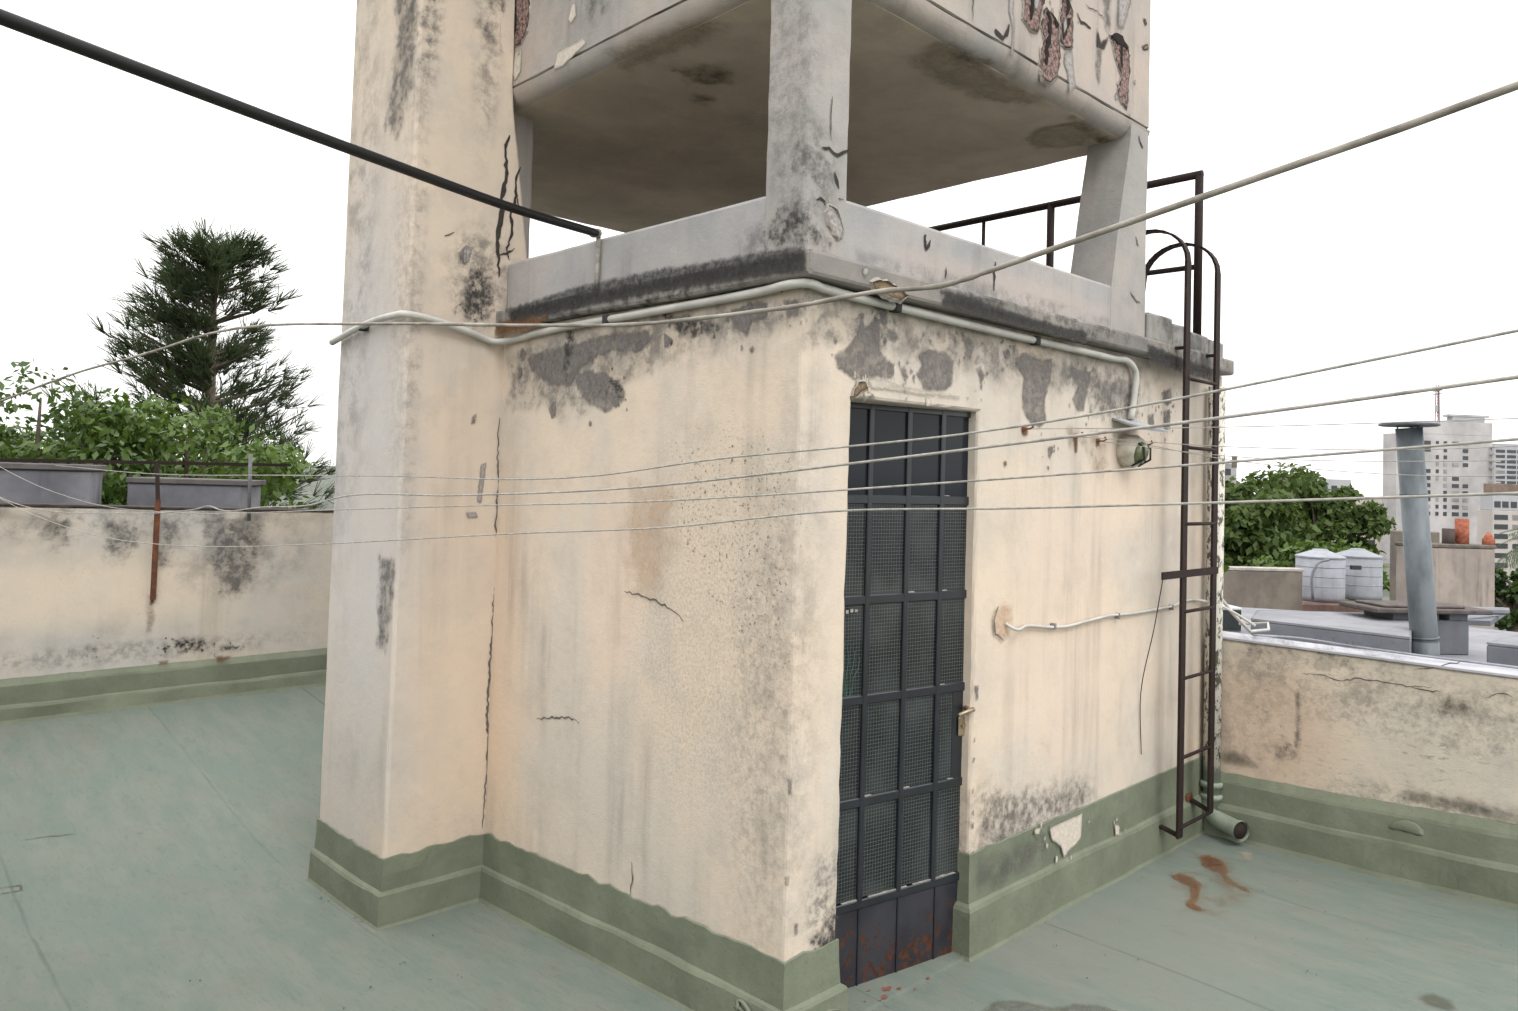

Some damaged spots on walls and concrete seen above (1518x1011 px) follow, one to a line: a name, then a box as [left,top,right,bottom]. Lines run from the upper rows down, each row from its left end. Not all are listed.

spalling [513,0,531,80]
spalling [554,39,586,69]
spalling [995,0,1079,93]
spalling [1108,0,1149,115]
leakage [459,206,831,323]
leakage [513,319,684,403]
leakage [938,333,1131,420]
leakage [208,517,259,591]
leakage [985,790,1084,839]
peeling [1035,814,1090,863]
corrosion [1173,855,1247,911]
leakage [988,1001,1112,1011]